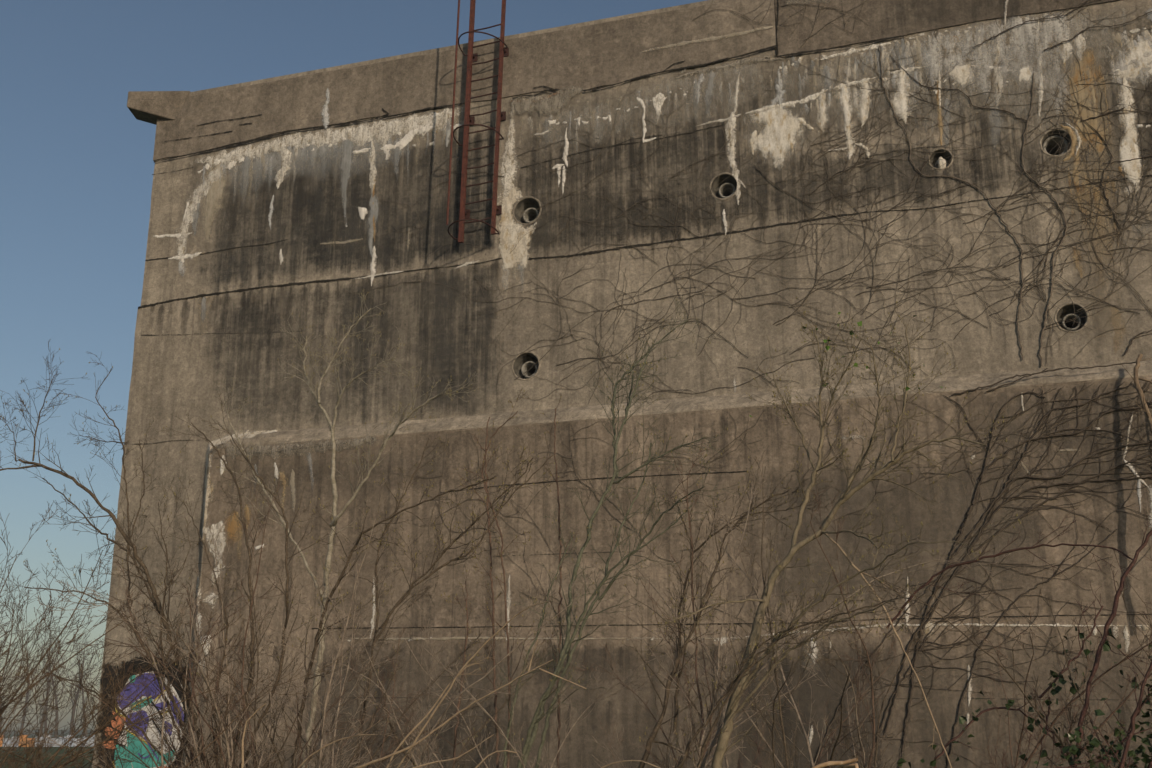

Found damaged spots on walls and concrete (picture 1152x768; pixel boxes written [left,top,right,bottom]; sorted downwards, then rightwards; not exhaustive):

water stain [153,0,1152,405]